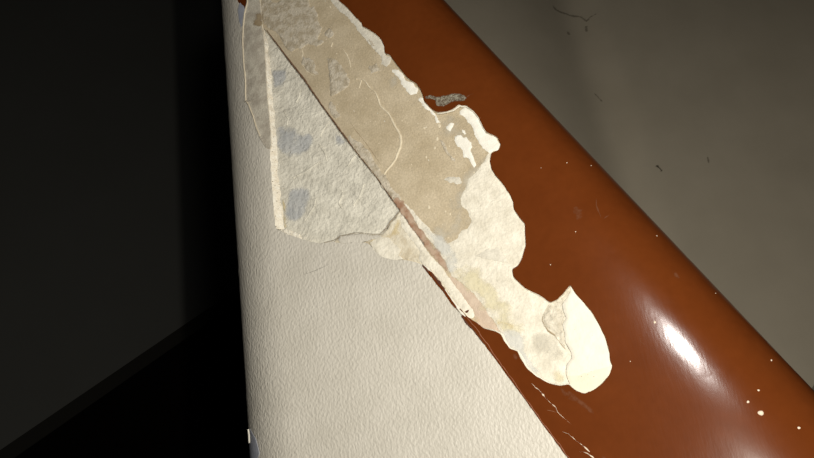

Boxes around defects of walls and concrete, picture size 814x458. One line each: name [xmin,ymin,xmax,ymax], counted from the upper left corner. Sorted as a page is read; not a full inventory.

peeling [238,0,612,394]
crack [422,264,594,458]